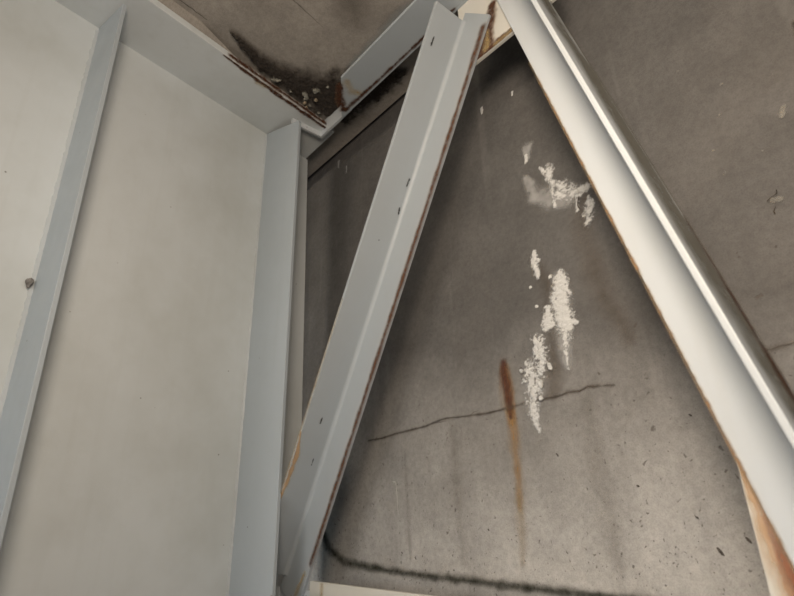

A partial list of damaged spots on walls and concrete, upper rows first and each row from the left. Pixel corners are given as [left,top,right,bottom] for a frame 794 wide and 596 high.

rust [223,54,327,128]
efflorescence [523,163,595,225]
rust [309,0,513,565]
crack [375,386,595,440]
rust [501,360,520,507]
efflorescence [519,249,579,433]
rust [684,217,794,400]
rust [722,433,794,596]